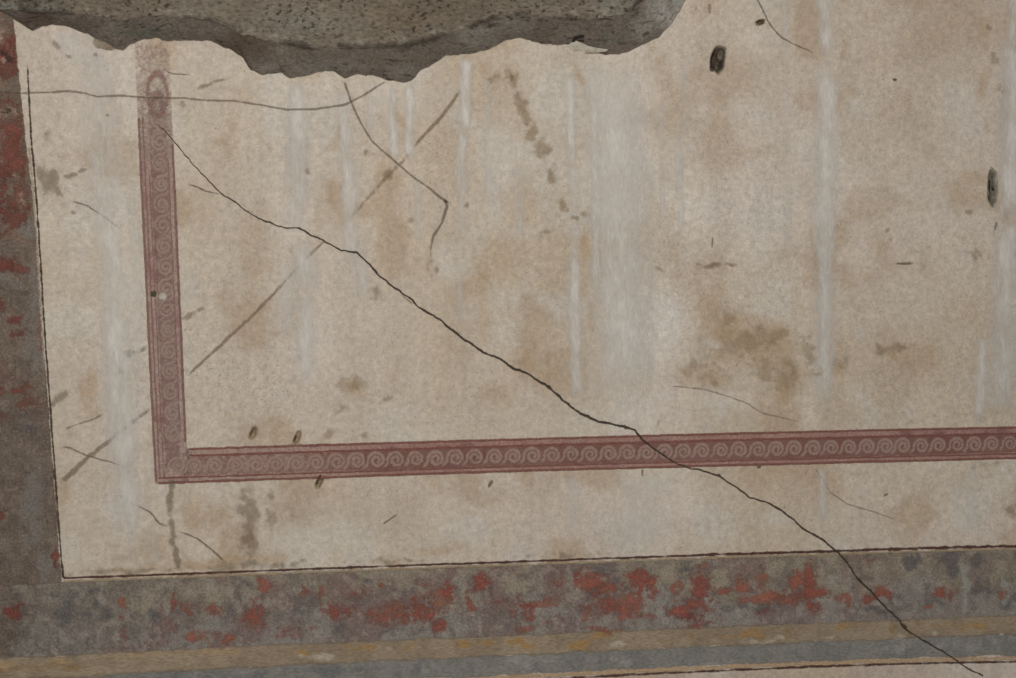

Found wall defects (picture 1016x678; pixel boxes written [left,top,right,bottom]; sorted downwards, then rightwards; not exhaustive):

peeling [0,99,31,241]
spalling [0,0,685,83]
water stain [339,96,366,296]
water stain [368,85,415,157]
water stain [455,60,471,212]
crack [158,125,983,676]
water stain [569,249,582,393]
water stain [587,74,642,390]
water stain [814,67,837,390]
water stain [976,226,1016,414]
water stain [1000,0,1016,214]